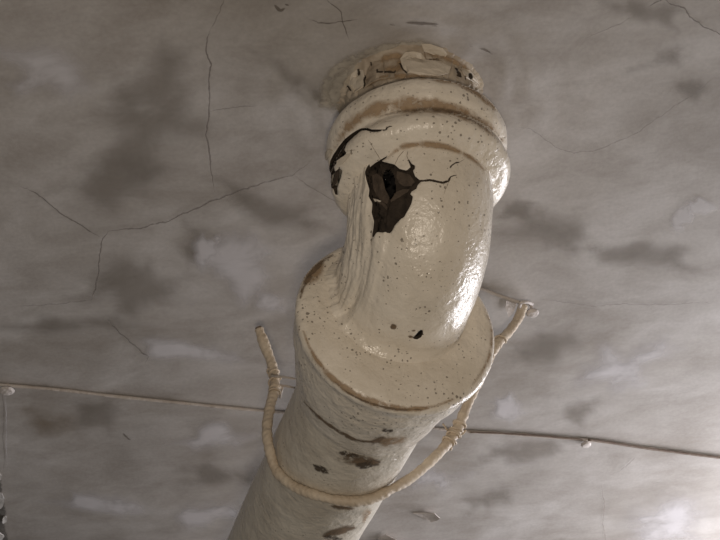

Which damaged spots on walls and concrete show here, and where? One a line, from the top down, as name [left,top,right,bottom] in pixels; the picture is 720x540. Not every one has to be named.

crack [205,37,213,179]
peeling [349,70,365,93]
peeling [400,43,451,76]
crack [130,169,300,229]
crack [34,192,106,294]